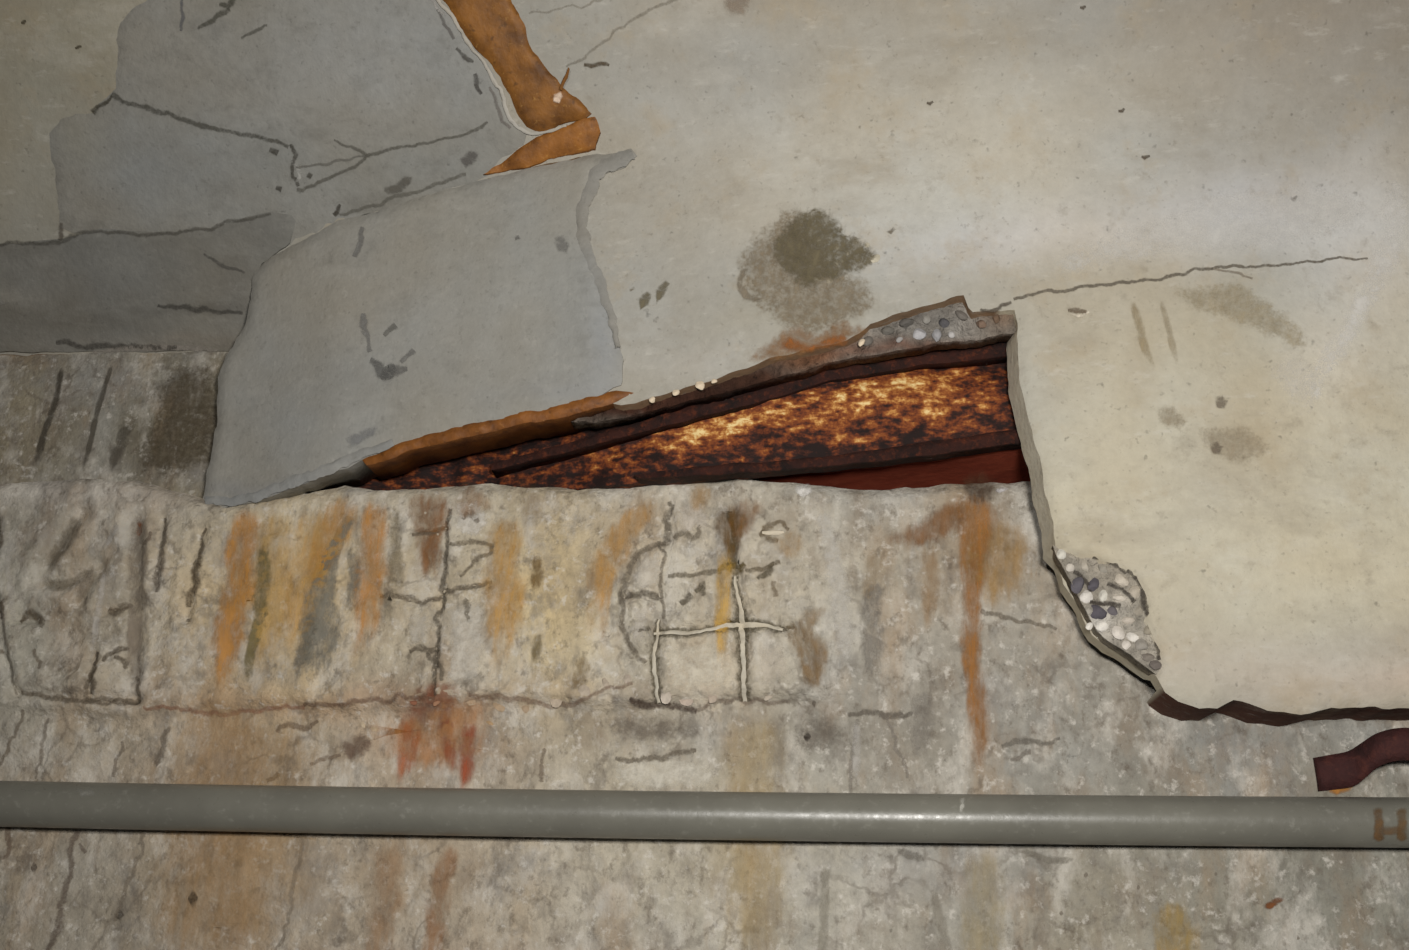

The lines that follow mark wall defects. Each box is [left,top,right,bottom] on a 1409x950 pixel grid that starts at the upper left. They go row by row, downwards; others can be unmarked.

corrosion [436,0,601,175]
spalling [360,313,415,379]
spalling [571,303,1016,430]
leakage [738,209,874,329]
crack [980,256,1368,312]
corrosion [363,391,633,480]
corrosion [634,429,1022,484]
crack [0,509,494,768]
crack [476,502,795,712]
corrosion [907,478,992,736]
spalling [1051,545,1163,676]
crack [616,749,696,763]